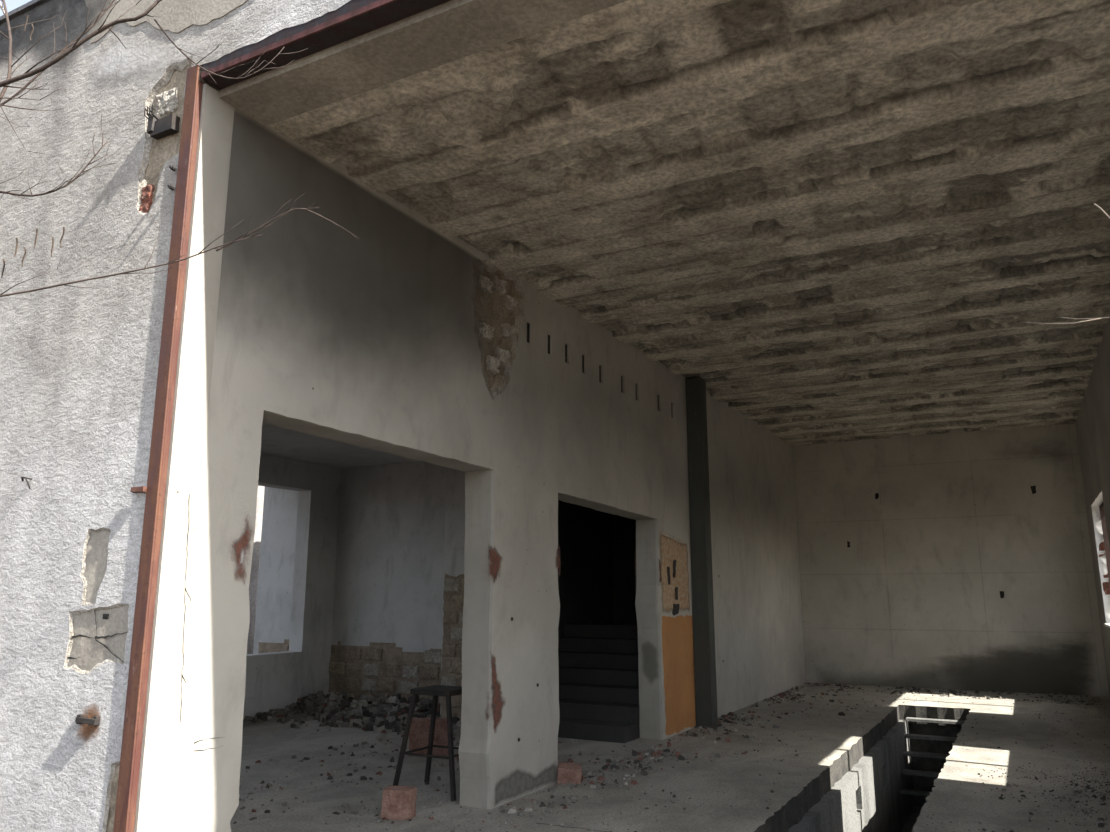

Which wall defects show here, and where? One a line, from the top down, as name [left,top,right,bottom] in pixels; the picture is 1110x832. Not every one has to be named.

flaking render [85,0,248,44]
spalling [137,56,193,217]
spalling [471,256,526,401]
flaking render [64,527,129,674]
spalling [234,523,251,578]
spalling [489,547,502,582]
peeling [659,534,690,615]
corrosion [80,706,99,739]